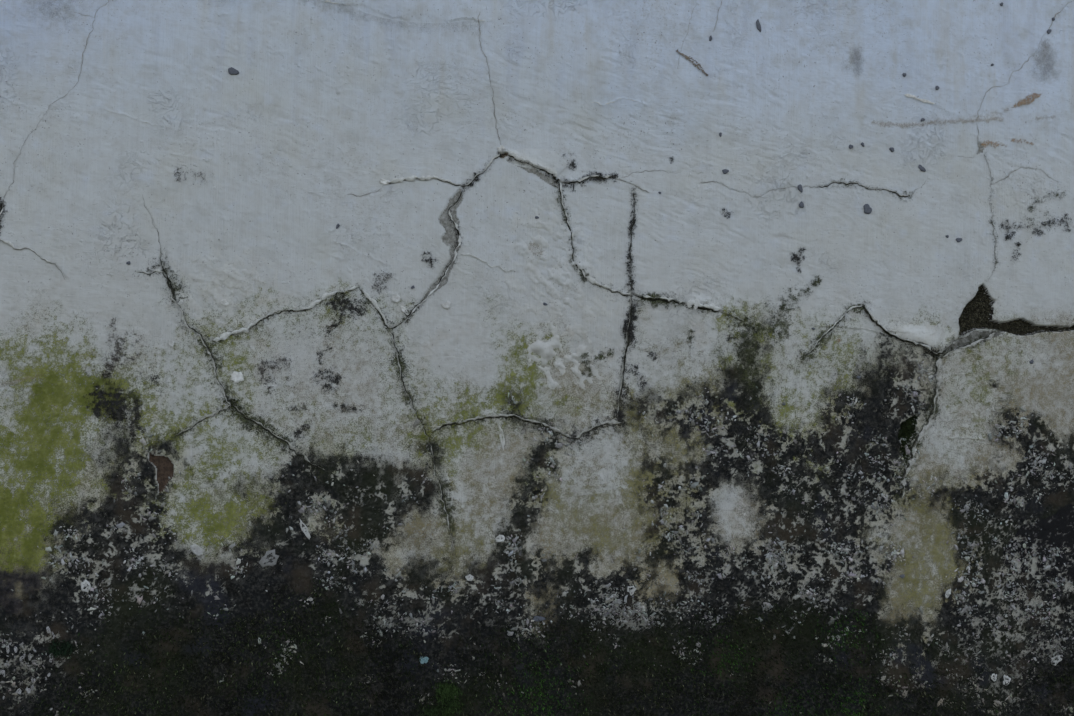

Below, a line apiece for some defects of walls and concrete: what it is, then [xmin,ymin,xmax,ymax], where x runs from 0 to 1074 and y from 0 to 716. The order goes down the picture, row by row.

crack [0,0,109,277]
crack [135,13,926,564]
damp [0,248,1074,716]
crack [797,302,1004,502]
flaking render [947,285,1074,351]